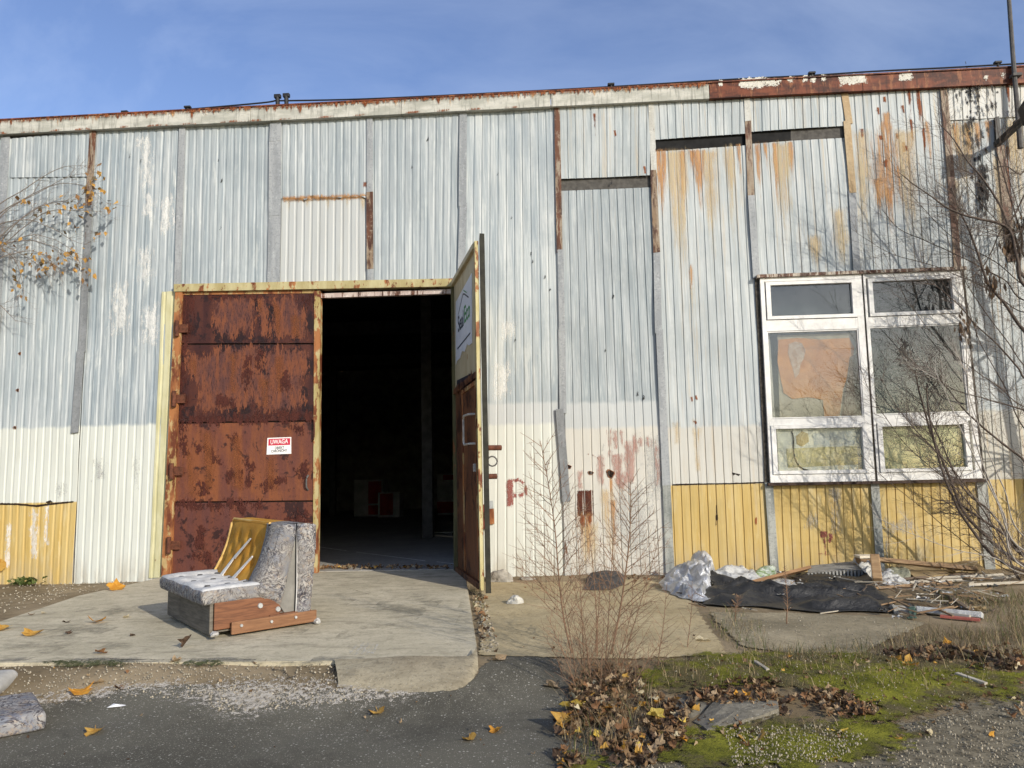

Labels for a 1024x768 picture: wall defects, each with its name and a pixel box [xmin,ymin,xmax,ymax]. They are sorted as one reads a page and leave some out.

peeling [738,74,868,90]
rust [283,182,367,204]
rust [643,148,741,238]
rust [755,142,793,191]
rust [857,90,931,218]
rust [178,294,314,436]
rust [175,498,265,512]
rust [577,479,616,559]